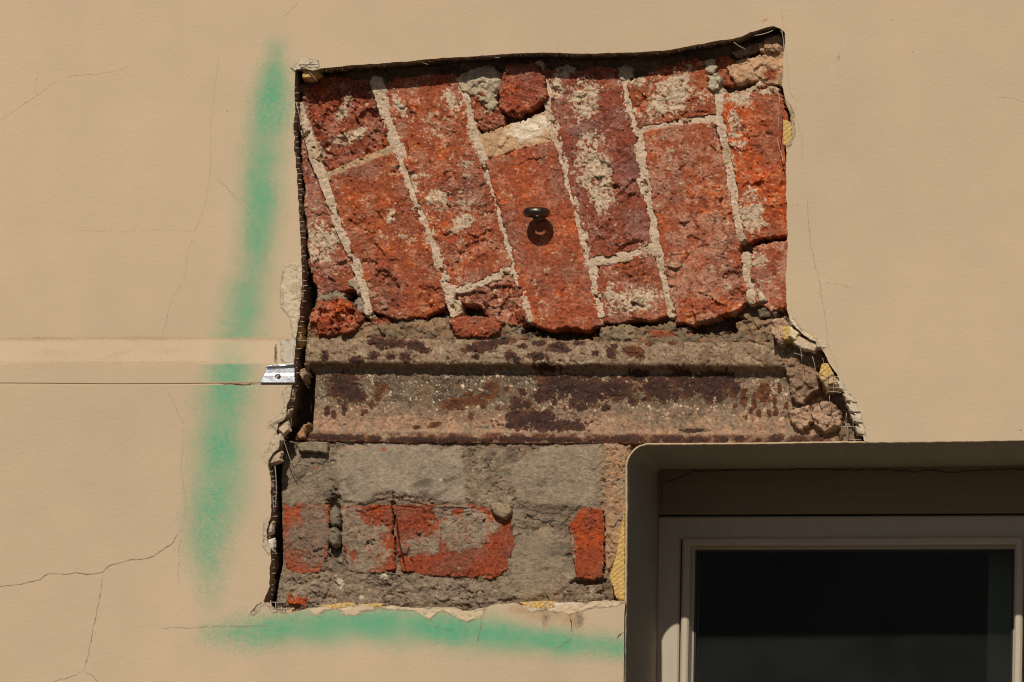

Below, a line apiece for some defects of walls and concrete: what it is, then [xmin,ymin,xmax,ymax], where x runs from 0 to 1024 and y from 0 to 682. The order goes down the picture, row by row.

flaking render [293,58,320,72]
flaking render [279,263,304,363]
flaking render [788,316,829,354]
flaking render [262,385,330,475]
flaking render [836,377,868,442]
flaking render [262,517,276,556]
crack [0,538,180,682]
flaking render [517,600,624,616]